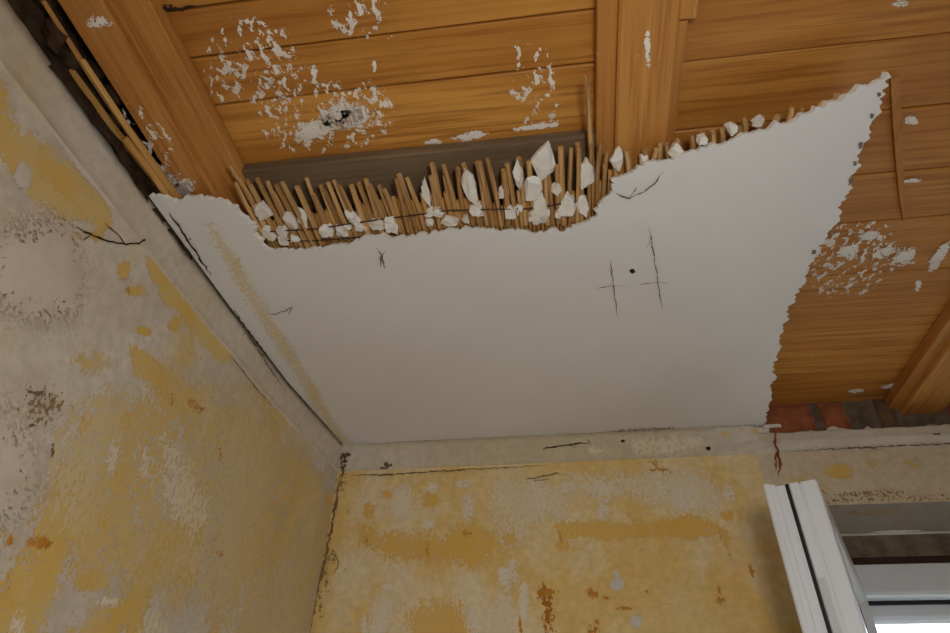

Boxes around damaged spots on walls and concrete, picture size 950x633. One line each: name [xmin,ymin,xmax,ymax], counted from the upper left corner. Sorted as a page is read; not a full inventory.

flaking render [0,0,193,260]
peeling [114,254,236,365]
peeling [128,325,207,418]
peeling [0,411,225,633]
corrosion [536,581,559,633]